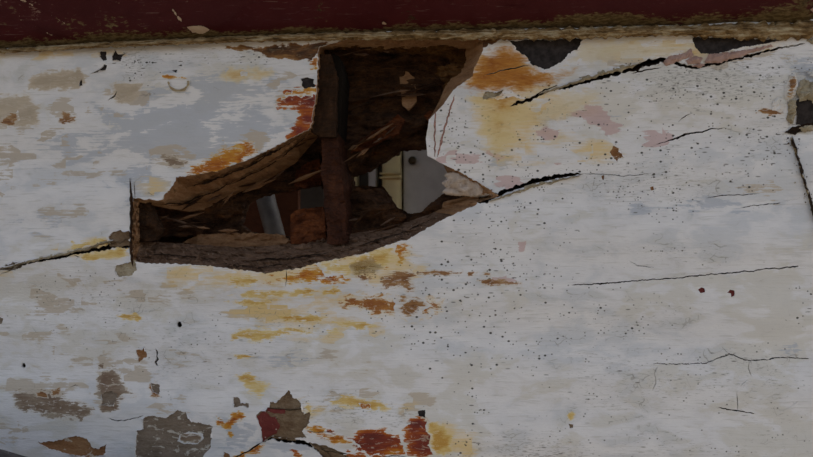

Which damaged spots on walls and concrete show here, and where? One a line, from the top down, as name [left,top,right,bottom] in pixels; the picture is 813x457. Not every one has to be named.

peeling [0,0,252,37]
crack [512,44,802,106]
rust [273,81,317,142]
rust [452,39,584,171]
peeling [796,100,813,125]
crack [477,173,643,204]
crack [708,123,813,215]
crack [0,240,130,273]
peeling [135,410,213,457]
rust [230,442,268,457]
peeling [256,390,348,457]
rust [303,400,456,457]